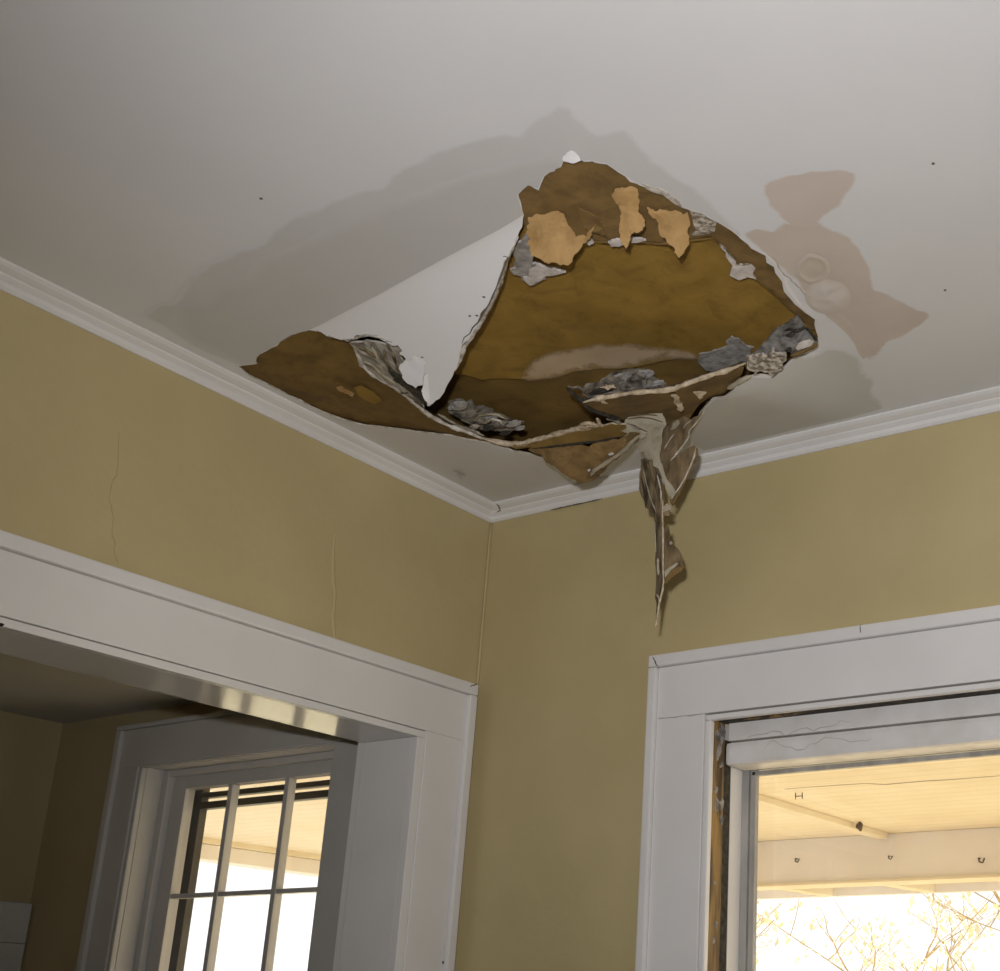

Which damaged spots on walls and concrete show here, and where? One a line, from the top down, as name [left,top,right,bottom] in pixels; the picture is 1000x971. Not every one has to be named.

peeling [562,151,581,163]
leakage [142,101,933,450]
peeling [608,235,646,247]
peeling [719,243,756,280]
peeling [786,332,813,352]
peeling [241,330,598,448]
spalling [583,362,746,412]
peeling [587,435,640,477]